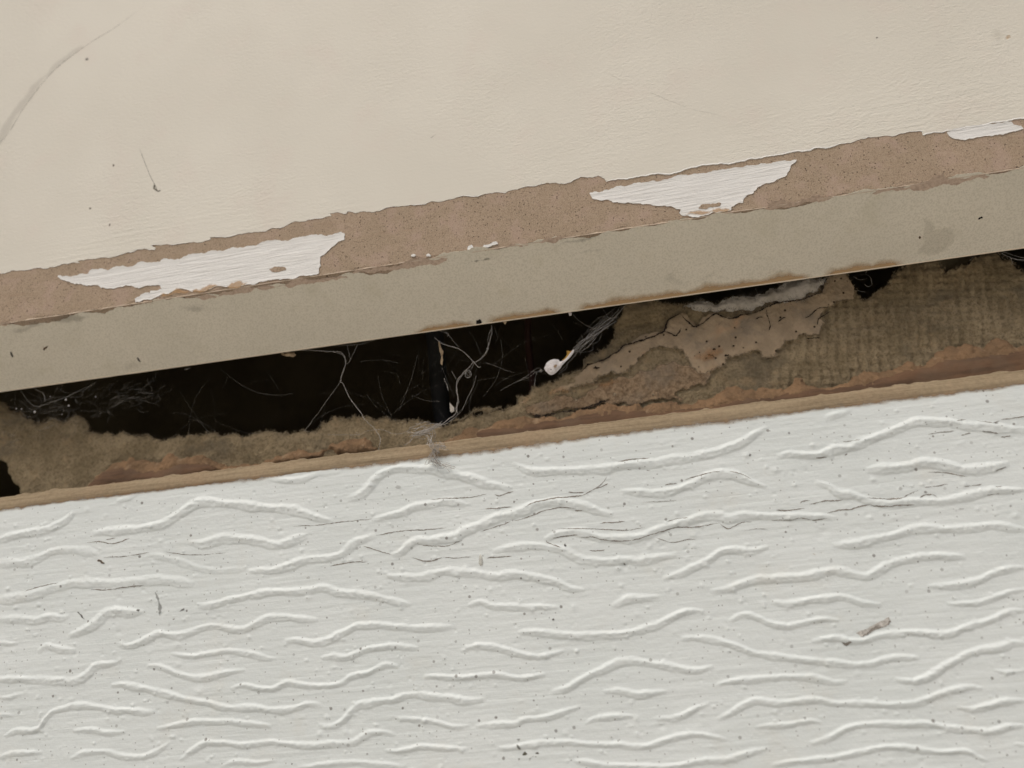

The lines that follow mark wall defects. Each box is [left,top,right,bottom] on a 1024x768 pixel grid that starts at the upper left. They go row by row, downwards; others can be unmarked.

peeling [0,119,1024,326]
spalling [0,332,435,441]
peeling [0,370,1024,511]
spalling [443,304,625,424]